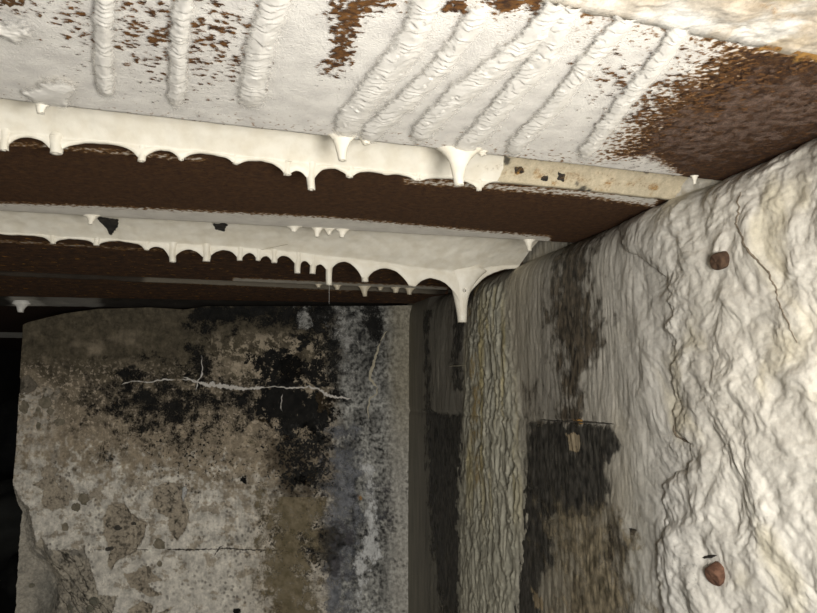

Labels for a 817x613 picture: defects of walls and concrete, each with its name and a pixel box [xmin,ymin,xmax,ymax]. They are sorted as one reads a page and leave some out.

rust [0,0,96,71]
rust [112,0,178,103]
rust [185,0,260,107]
efflorescence [0,0,636,188]
rust [578,48,654,104]
rust [606,38,817,176]
damp [0,211,538,391]
damp [71,306,393,613]
crack [122,331,387,419]
damp [423,310,463,613]
damp [514,229,641,613]